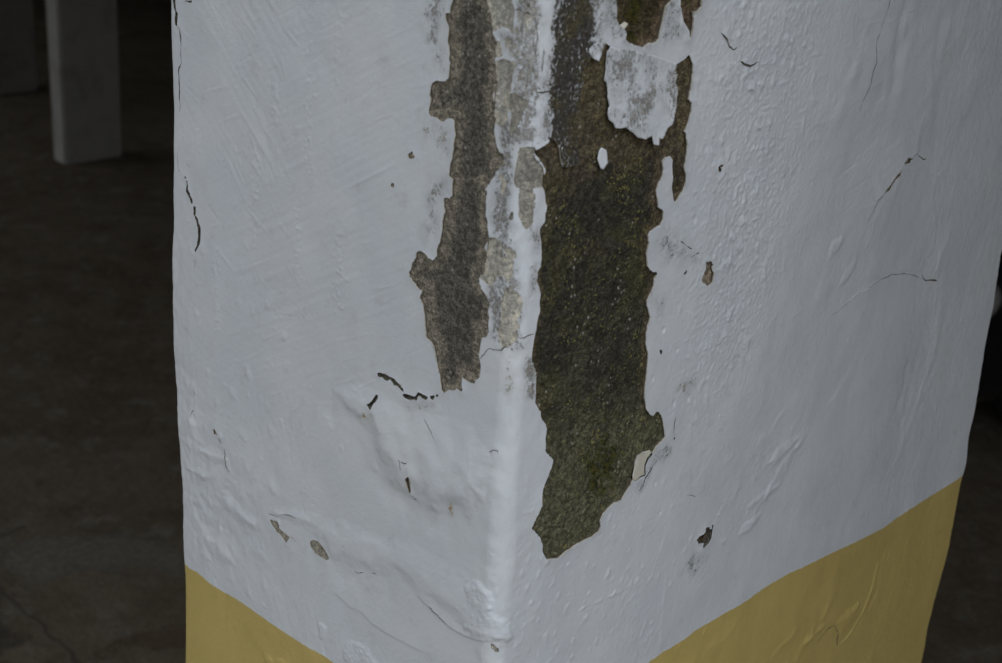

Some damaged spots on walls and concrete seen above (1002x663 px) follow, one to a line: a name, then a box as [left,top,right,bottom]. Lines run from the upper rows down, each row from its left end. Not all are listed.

crack [173,0,192,101]
crack [177,159,201,267]
spalling [409,0,533,393]
crack [869,154,925,220]
spalling [508,0,703,560]
peeling [702,261,714,286]
crack [363,373,445,437]
peeling [270,514,294,543]
peeling [310,540,329,560]
spalling [697,525,713,548]